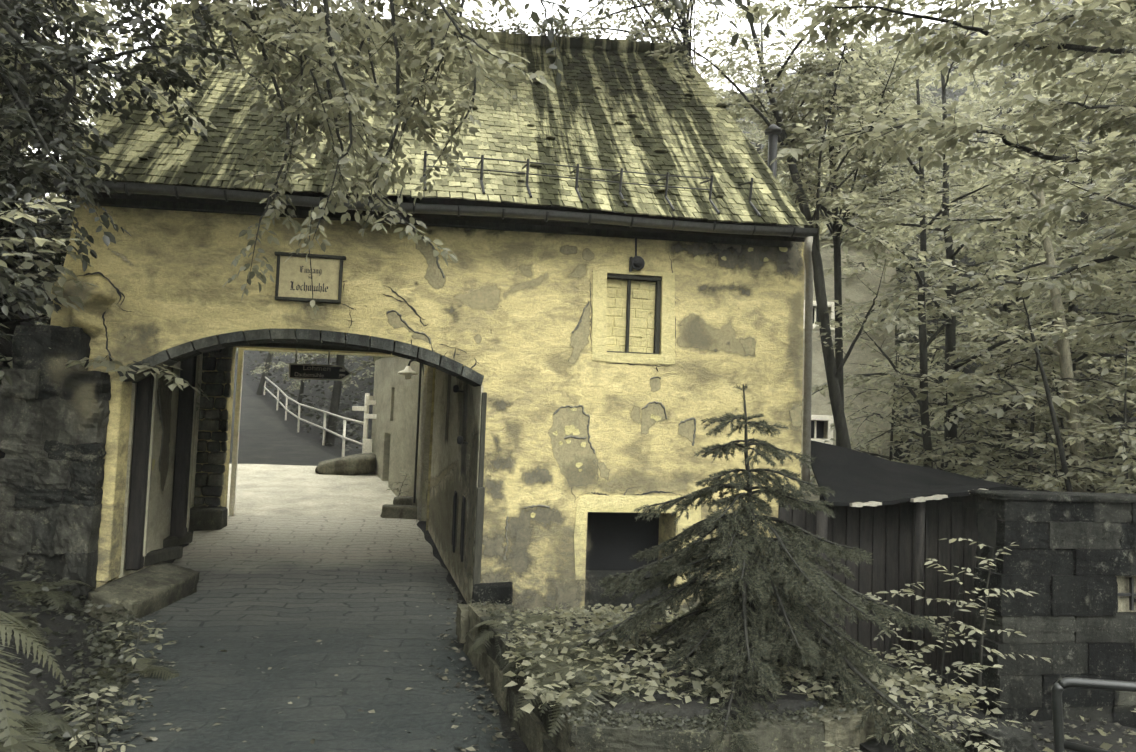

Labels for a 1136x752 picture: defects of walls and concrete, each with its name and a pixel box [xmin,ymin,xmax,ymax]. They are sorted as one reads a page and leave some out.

peeling [411,229,446,289]
crack [78,272,132,372]
crack [383,285,479,369]
peeling [446,264,548,318]
peeling [568,301,591,364]
peeling [677,313,756,356]
peeling [489,399,512,411]
flaking render [630,376,696,446]
flaking render [484,405,610,490]